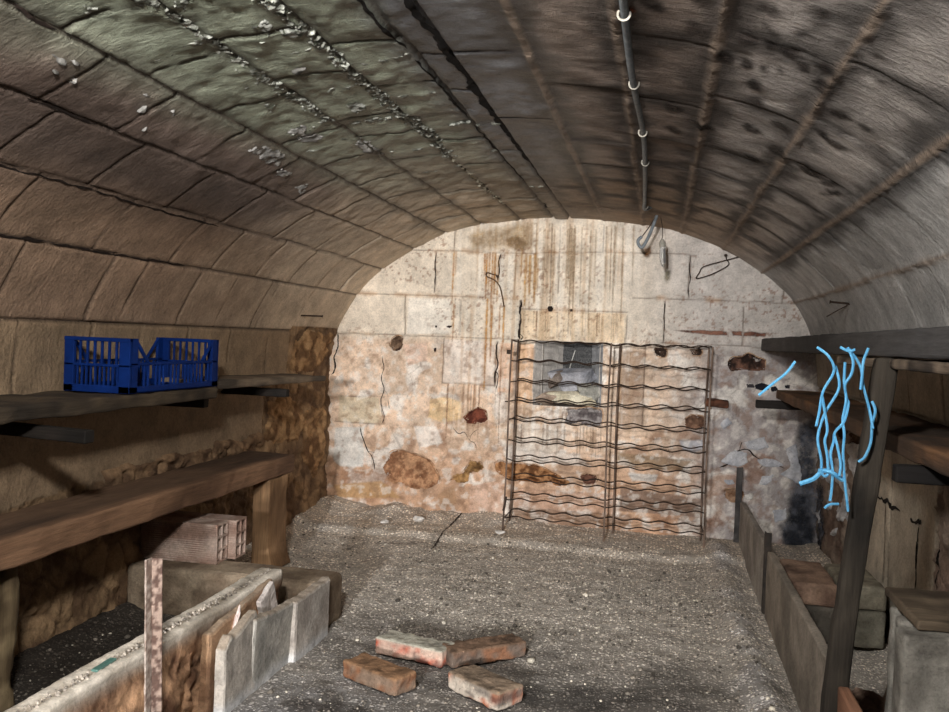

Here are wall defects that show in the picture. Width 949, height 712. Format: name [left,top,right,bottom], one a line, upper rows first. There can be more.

peeling [52,54,80,84]
leakage [718,50,765,104]
leakage [818,130,844,149]
leakage [800,163,840,195]
rust [484,254,505,382]
spalling [463,407,488,424]
spalling [383,449,570,489]
spalling [580,473,599,484]
leakage [781,422,825,550]
peeling [815,427,860,536]
crack [379,512,463,548]
crack [878,496,940,589]